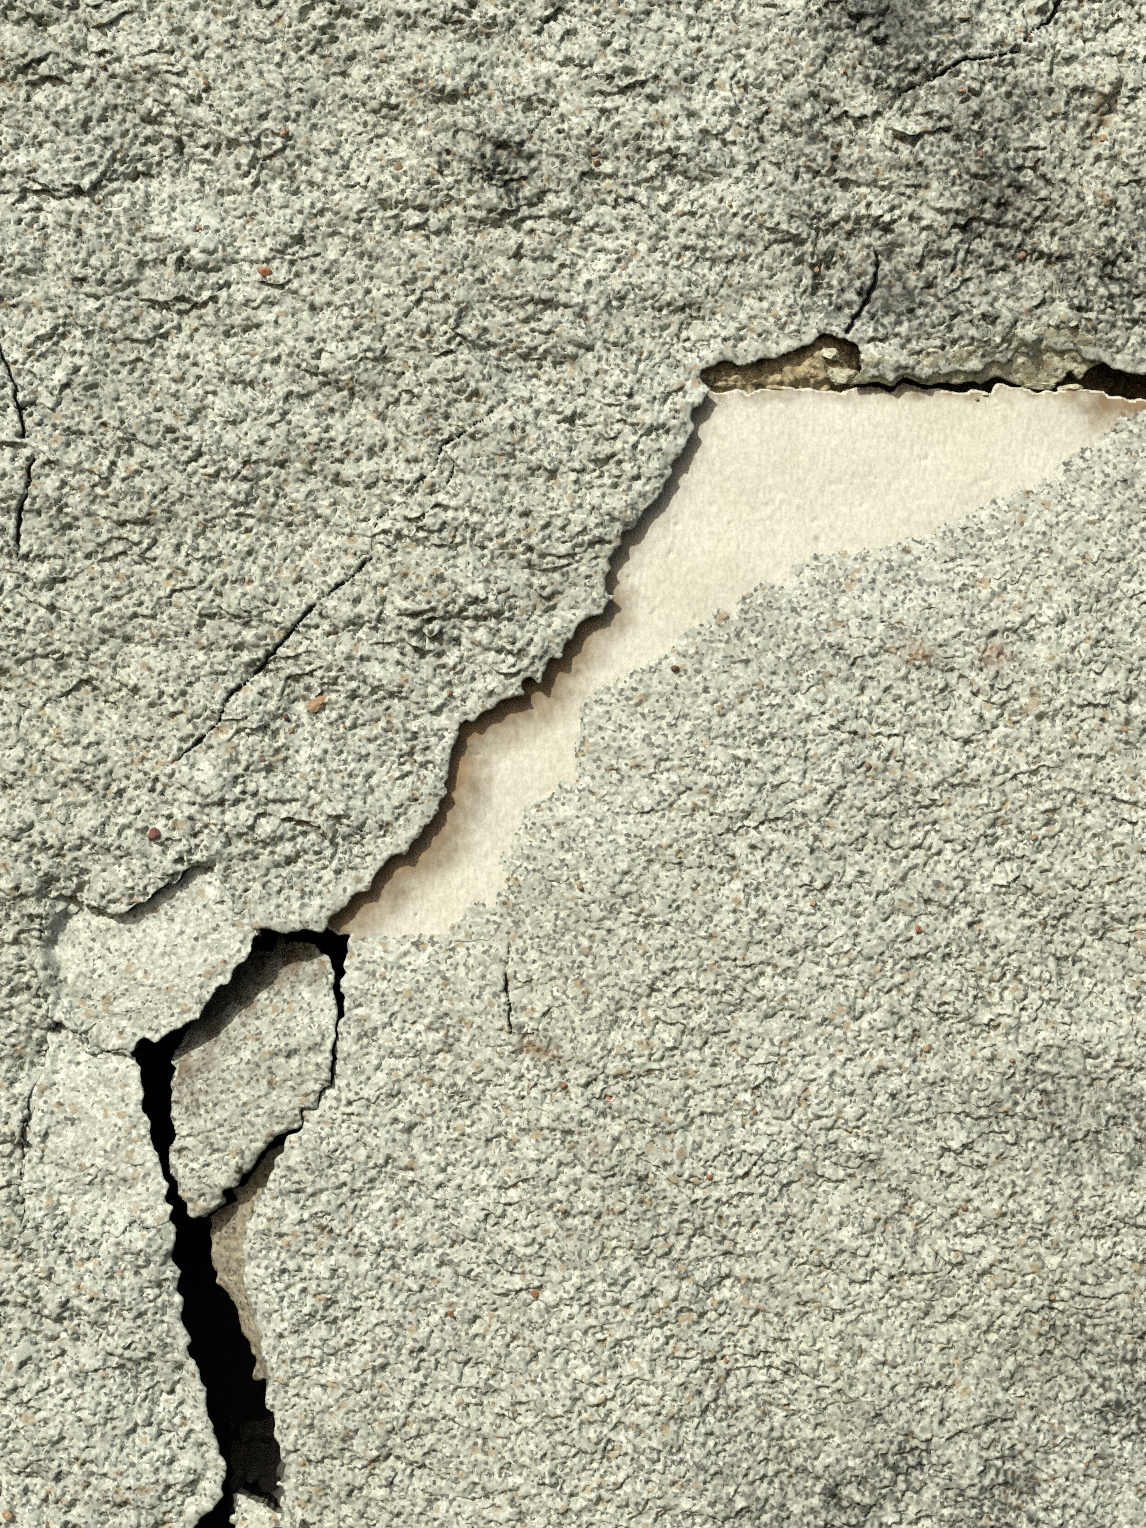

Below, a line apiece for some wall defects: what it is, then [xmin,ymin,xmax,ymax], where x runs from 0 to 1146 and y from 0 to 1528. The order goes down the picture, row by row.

crack [899,0,1061,96]
crack [0,349,43,560]
crack [158,412,491,795]
spalling [327,383,1146,942]
crack [700,254,1146,401]
crack [134,927,350,1528]